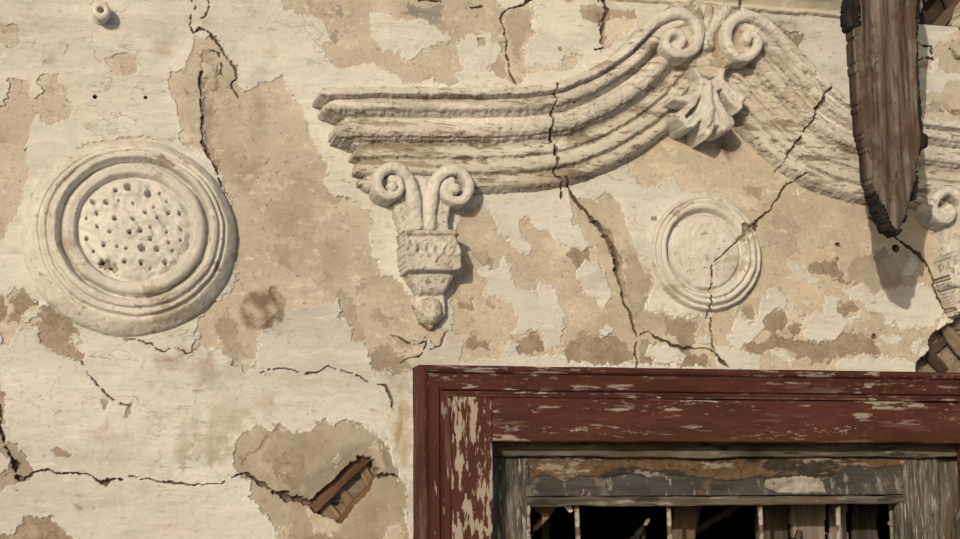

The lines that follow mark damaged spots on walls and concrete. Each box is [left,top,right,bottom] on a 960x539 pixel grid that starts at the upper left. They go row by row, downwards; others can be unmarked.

crack [189,0,239,187]
peeling [282,0,583,87]
crack [594,0,609,51]
peeling [0,74,73,241]
peeling [0,289,85,361]
spalling [77,177,191,282]
peeling [168,35,960,376]
crack [548,82,834,368]
crack [894,236,960,314]
crack [260,365,394,409]
crack [0,404,311,505]
peeling [233,419,410,539]